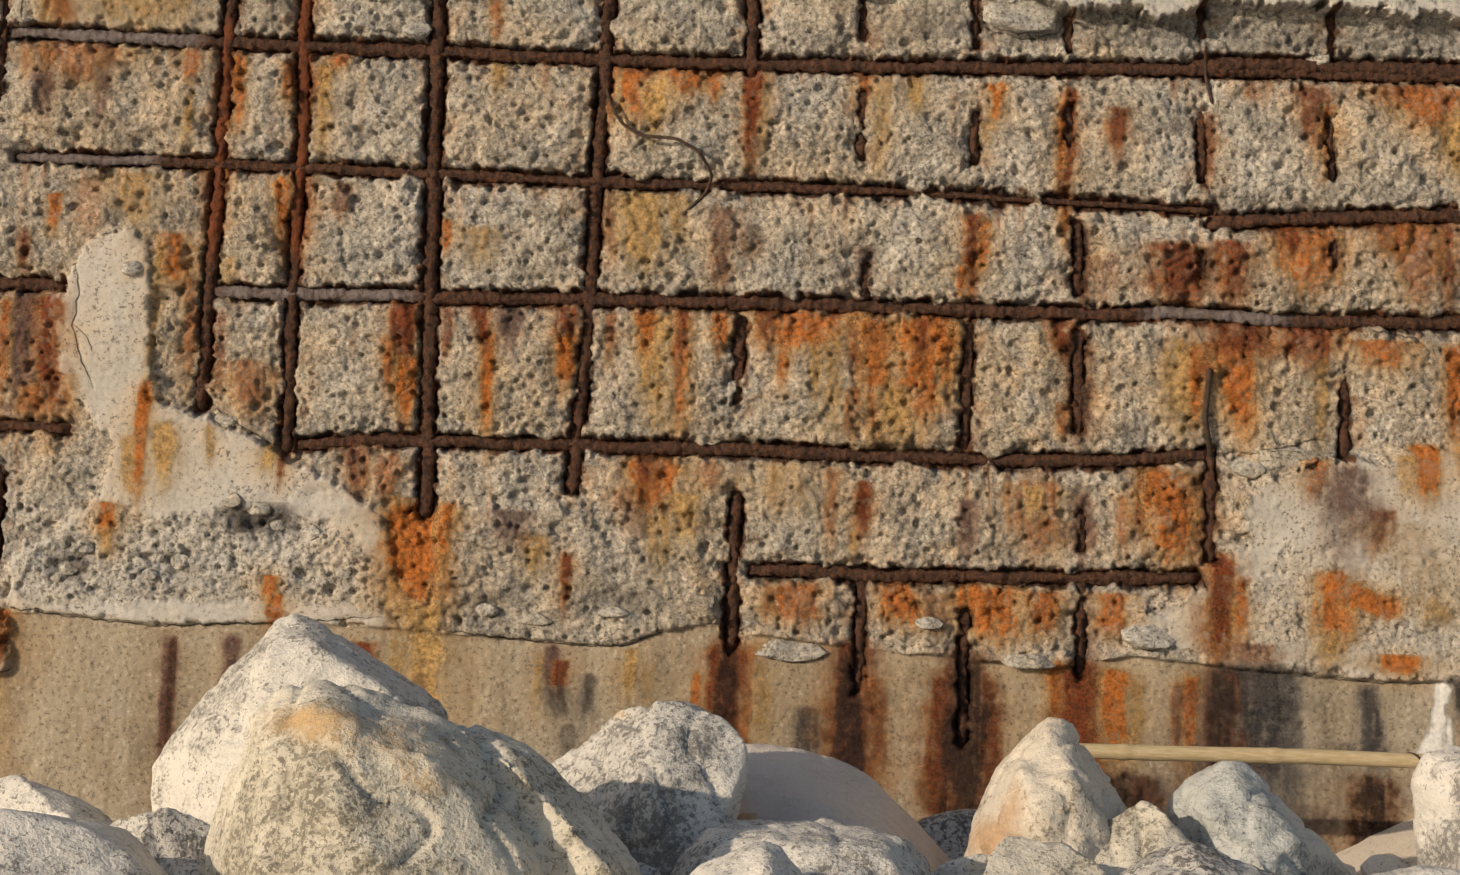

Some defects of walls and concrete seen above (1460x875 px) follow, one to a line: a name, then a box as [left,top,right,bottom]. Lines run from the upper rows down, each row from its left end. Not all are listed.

corrosion [1147,225,1346,306]
corrosion [120,232,198,498]
spalling [0,0,1460,681]
corrosion [753,310,962,446]
corrosion [345,446,456,709]
corrosion [690,641,754,744]
corrosion [819,641,887,779]
corrosion [876,582,1063,815]
corrosion [1043,660,1145,771]
damp [1105,772,1165,811]
damp [1346,686,1398,847]
damp [1416,680,1460,754]